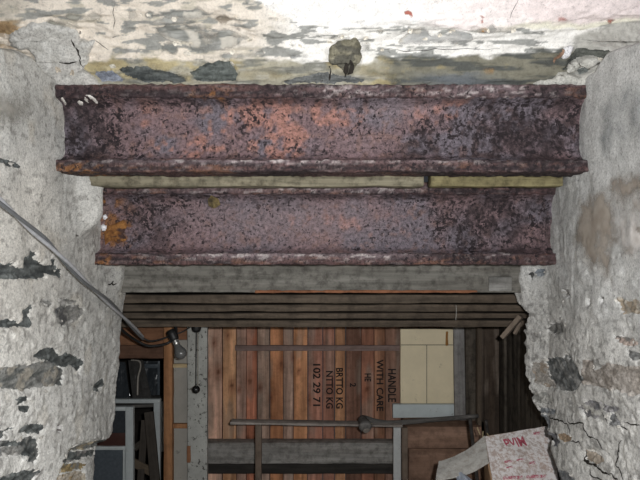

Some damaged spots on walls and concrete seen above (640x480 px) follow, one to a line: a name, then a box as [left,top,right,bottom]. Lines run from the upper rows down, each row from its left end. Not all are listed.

crack [59,31,84,68]
peeling [95,9,253,84]
peeling [399,26,497,44]
flaking render [553,45,611,70]
flaking render [284,72,364,85]
rust [104,220,127,245]
flaking render [0,251,61,281]
flaking render [0,304,32,328]
flaking render [40,297,83,326]
flaking render [0,346,83,413]
crack [550,413,639,480]